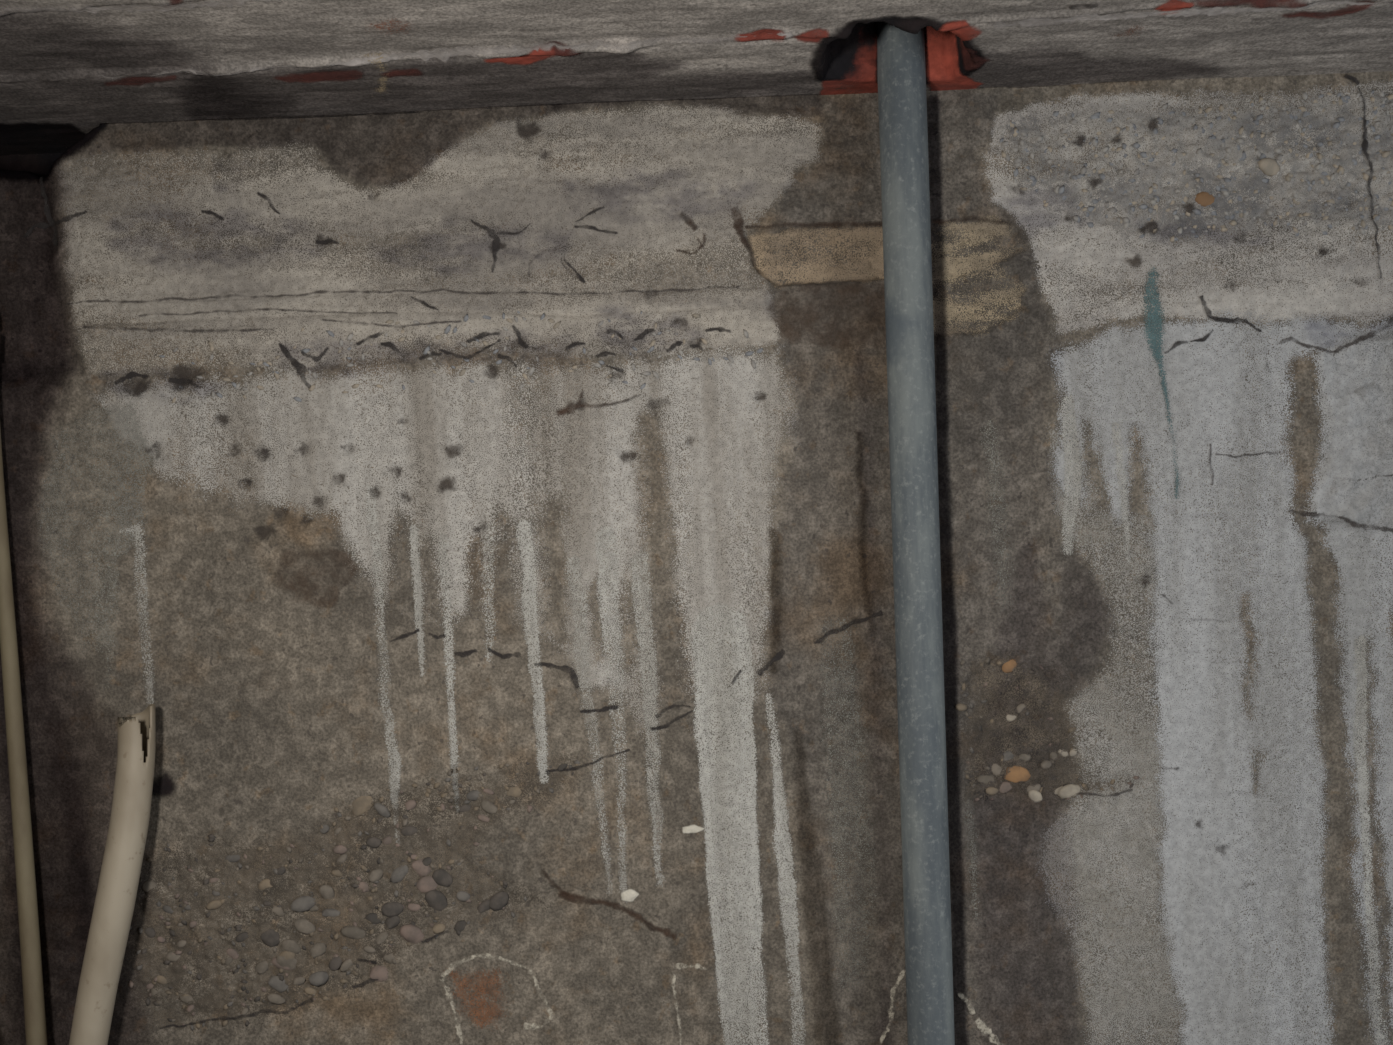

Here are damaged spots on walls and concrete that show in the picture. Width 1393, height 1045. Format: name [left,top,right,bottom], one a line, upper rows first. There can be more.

crack [201,210,223,220]
crack [257,192,280,214]
crack [471,220,530,272]
crack [574,207,617,234]
crack [1344,75,1381,278]
crack [115,371,198,387]
crack [279,326,528,386]
crack [566,327,730,372]
crack [1170,295,1393,355]
damp [1032,264,1393,1045]
damp [34,335,808,1045]
damp [816,610,882,991]